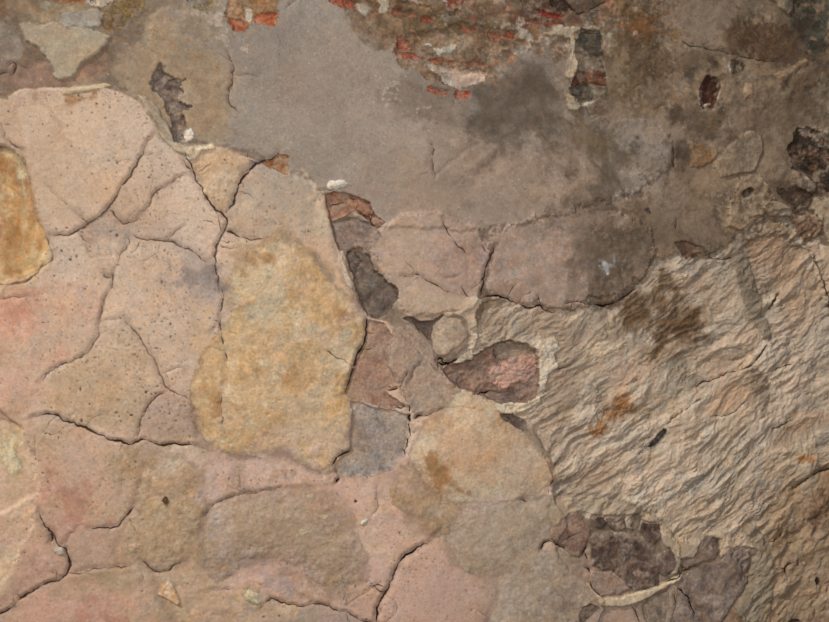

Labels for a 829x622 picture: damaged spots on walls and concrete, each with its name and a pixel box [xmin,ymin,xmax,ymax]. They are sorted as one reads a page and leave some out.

peeling [55,0,145,31]
peeling [194,0,279,32]
peeling [329,0,519,98]
damp [399,6,483,39]
peeling [521,0,607,112]
damp [615,12,675,100]
crack [48,154,274,357]
crack [443,224,548,311]
crack [346,319,370,389]
crack [42,413,192,446]
crack [0,516,80,614]
crack [268,543,425,622]